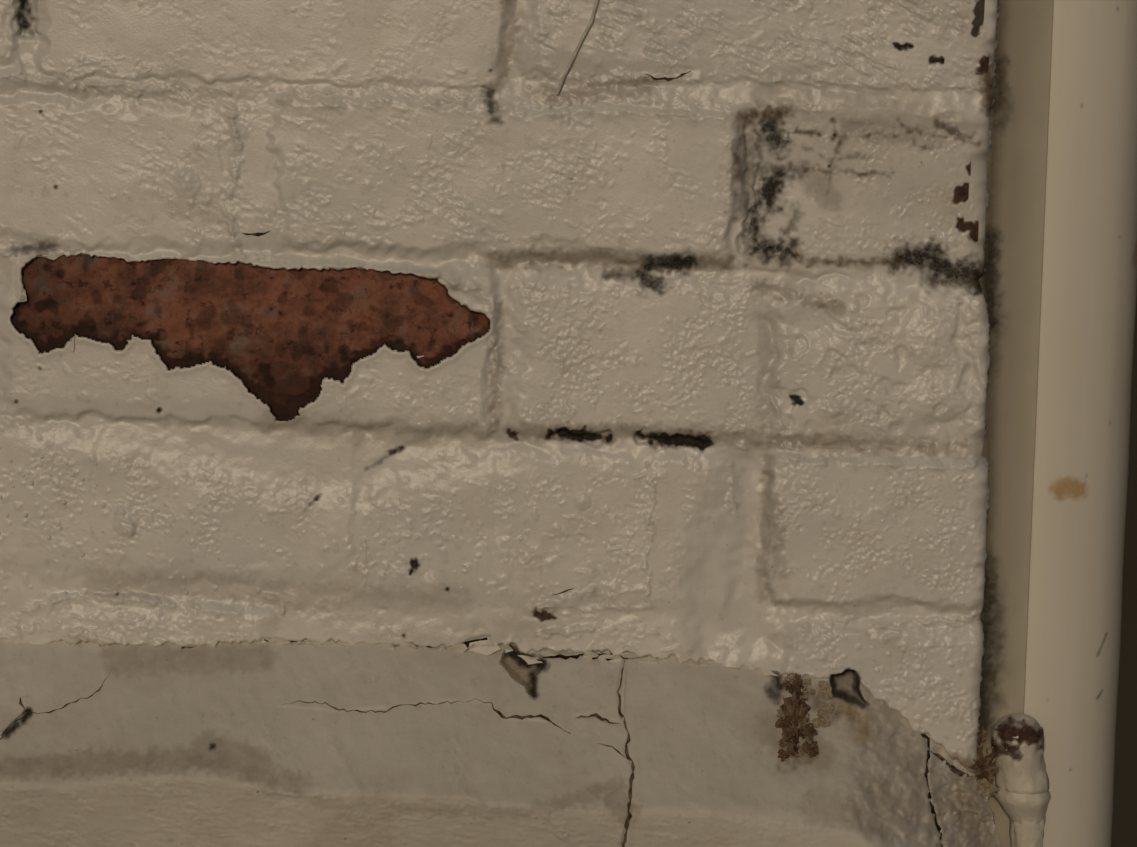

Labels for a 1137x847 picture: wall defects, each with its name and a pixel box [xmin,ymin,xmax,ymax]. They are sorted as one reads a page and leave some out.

damp [740,107,820,149]
damp [748,169,798,262]
damp [825,233,997,328]
spalling [11,253,490,421]
crack [0,645,111,740]
crack [375,637,514,653]
crack [279,648,659,847]
damp [767,673,784,700]
spalling [830,669,865,735]
crack [921,734,973,847]
damp [978,570,995,730]